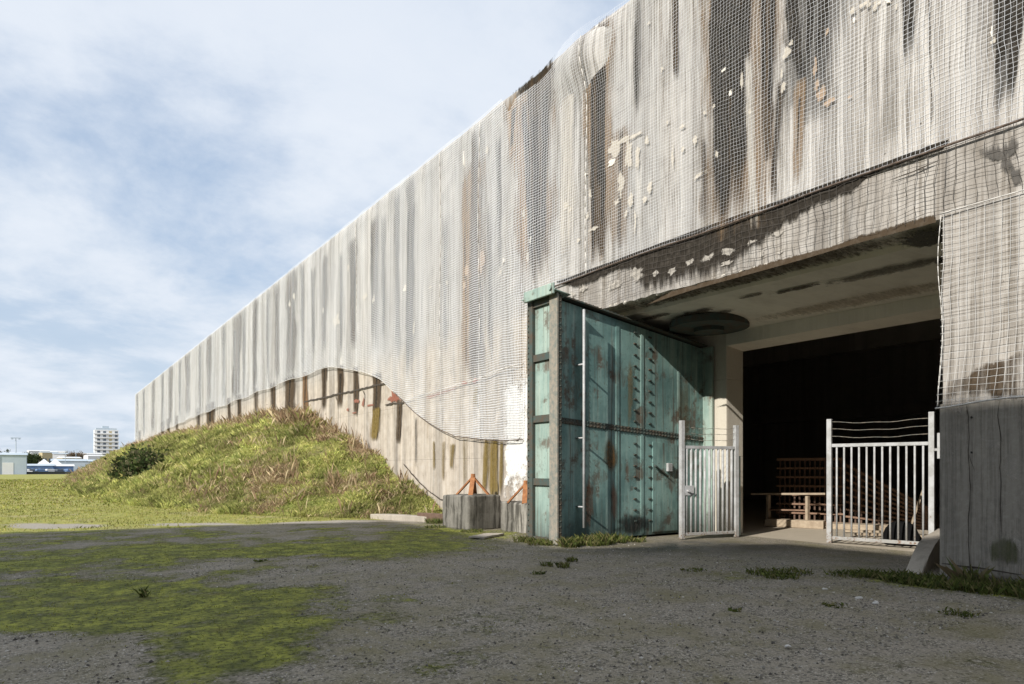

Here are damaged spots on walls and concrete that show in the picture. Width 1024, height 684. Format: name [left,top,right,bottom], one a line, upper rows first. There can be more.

damp [993,0,1024,104]
peeling [607,131,652,227]
damp [461,0,949,402]
damp [370,373,381,440]
damp [482,437,503,495]
rust [585,479,593,524]
rust [605,440,616,469]
rust [611,485,649,533]
crack [942,401,1022,575]